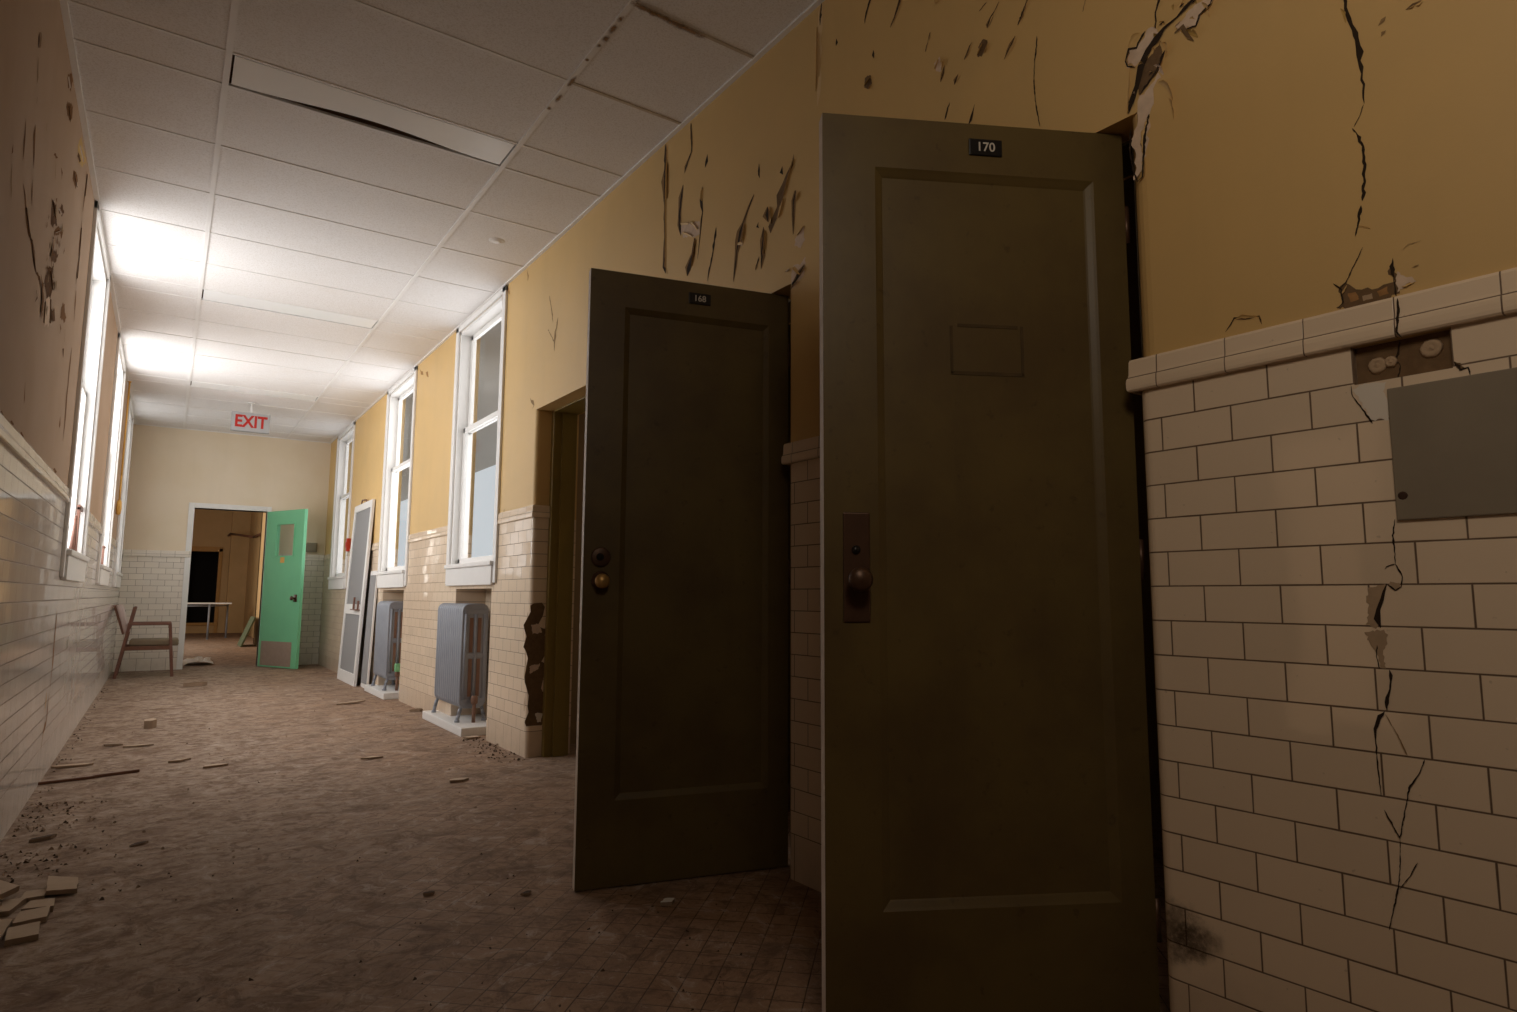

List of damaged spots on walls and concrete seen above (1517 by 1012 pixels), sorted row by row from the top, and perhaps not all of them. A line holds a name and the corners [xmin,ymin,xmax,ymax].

peeling [23,73,88,437]
peeling [661,124,700,276]
peeling [733,155,806,290]
peeling [1125,0,1213,182]
crack [1340,0,1370,236]
crack [1394,298,1402,338]
spalling [523,603,545,726]
crack [1364,520,1425,930]